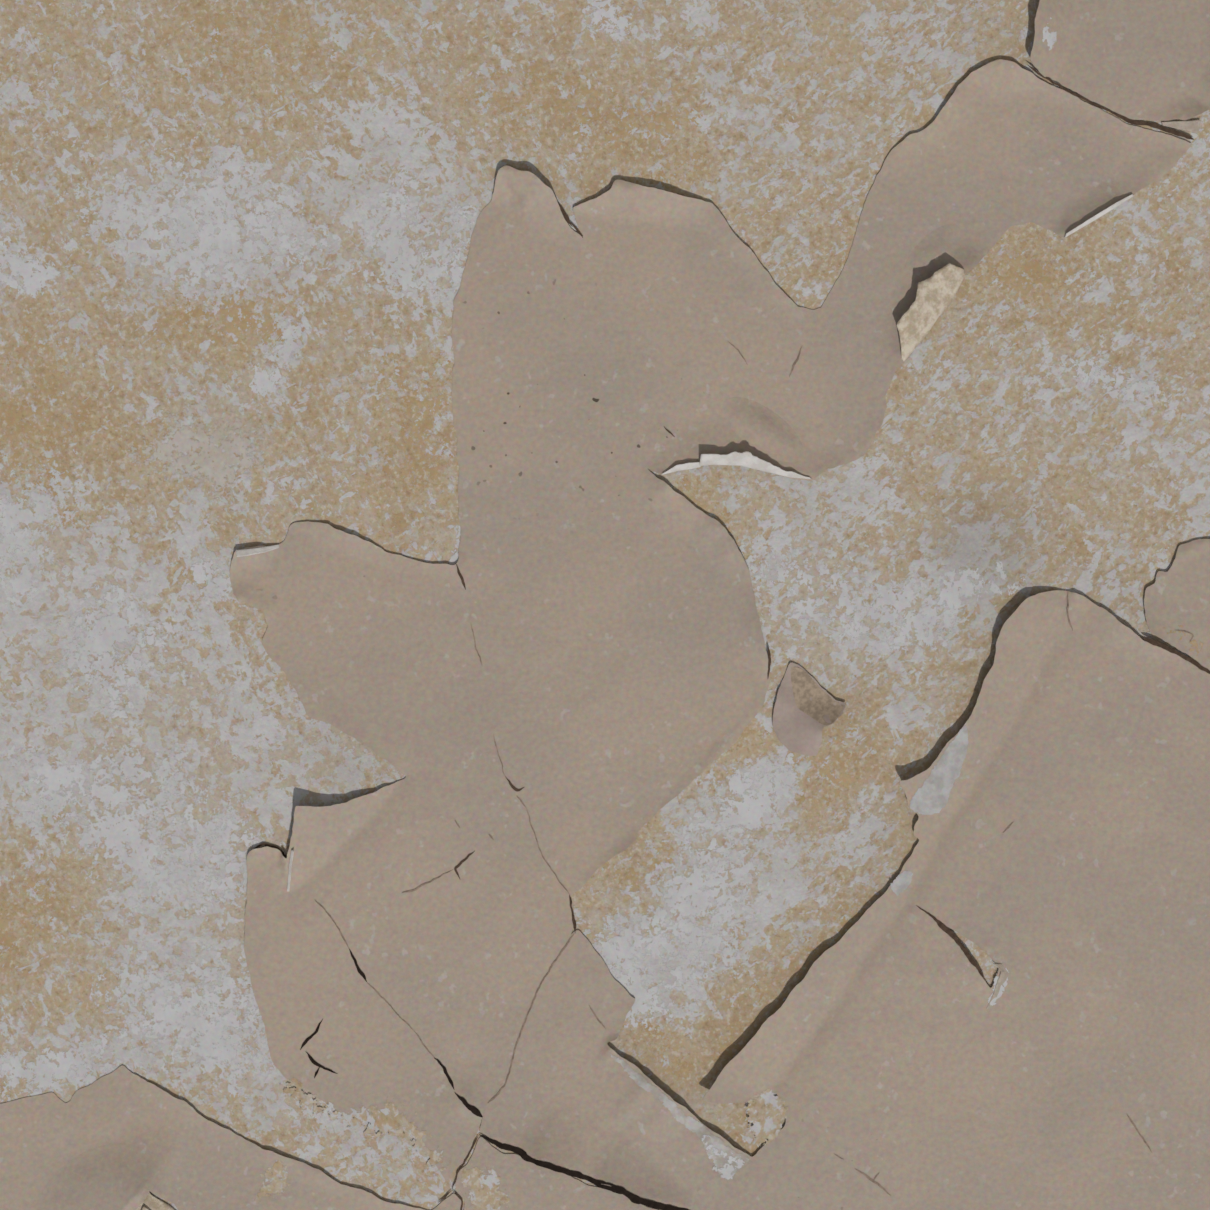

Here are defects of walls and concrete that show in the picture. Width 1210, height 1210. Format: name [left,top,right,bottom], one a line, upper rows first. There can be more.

peeling [1030,0,1210,134]
peeling [230,59,1210,1210]
crack [315,739,688,1210]
crack [916,905,985,980]
crack [300,1019,337,1078]
peeling [0,1065,426,1210]